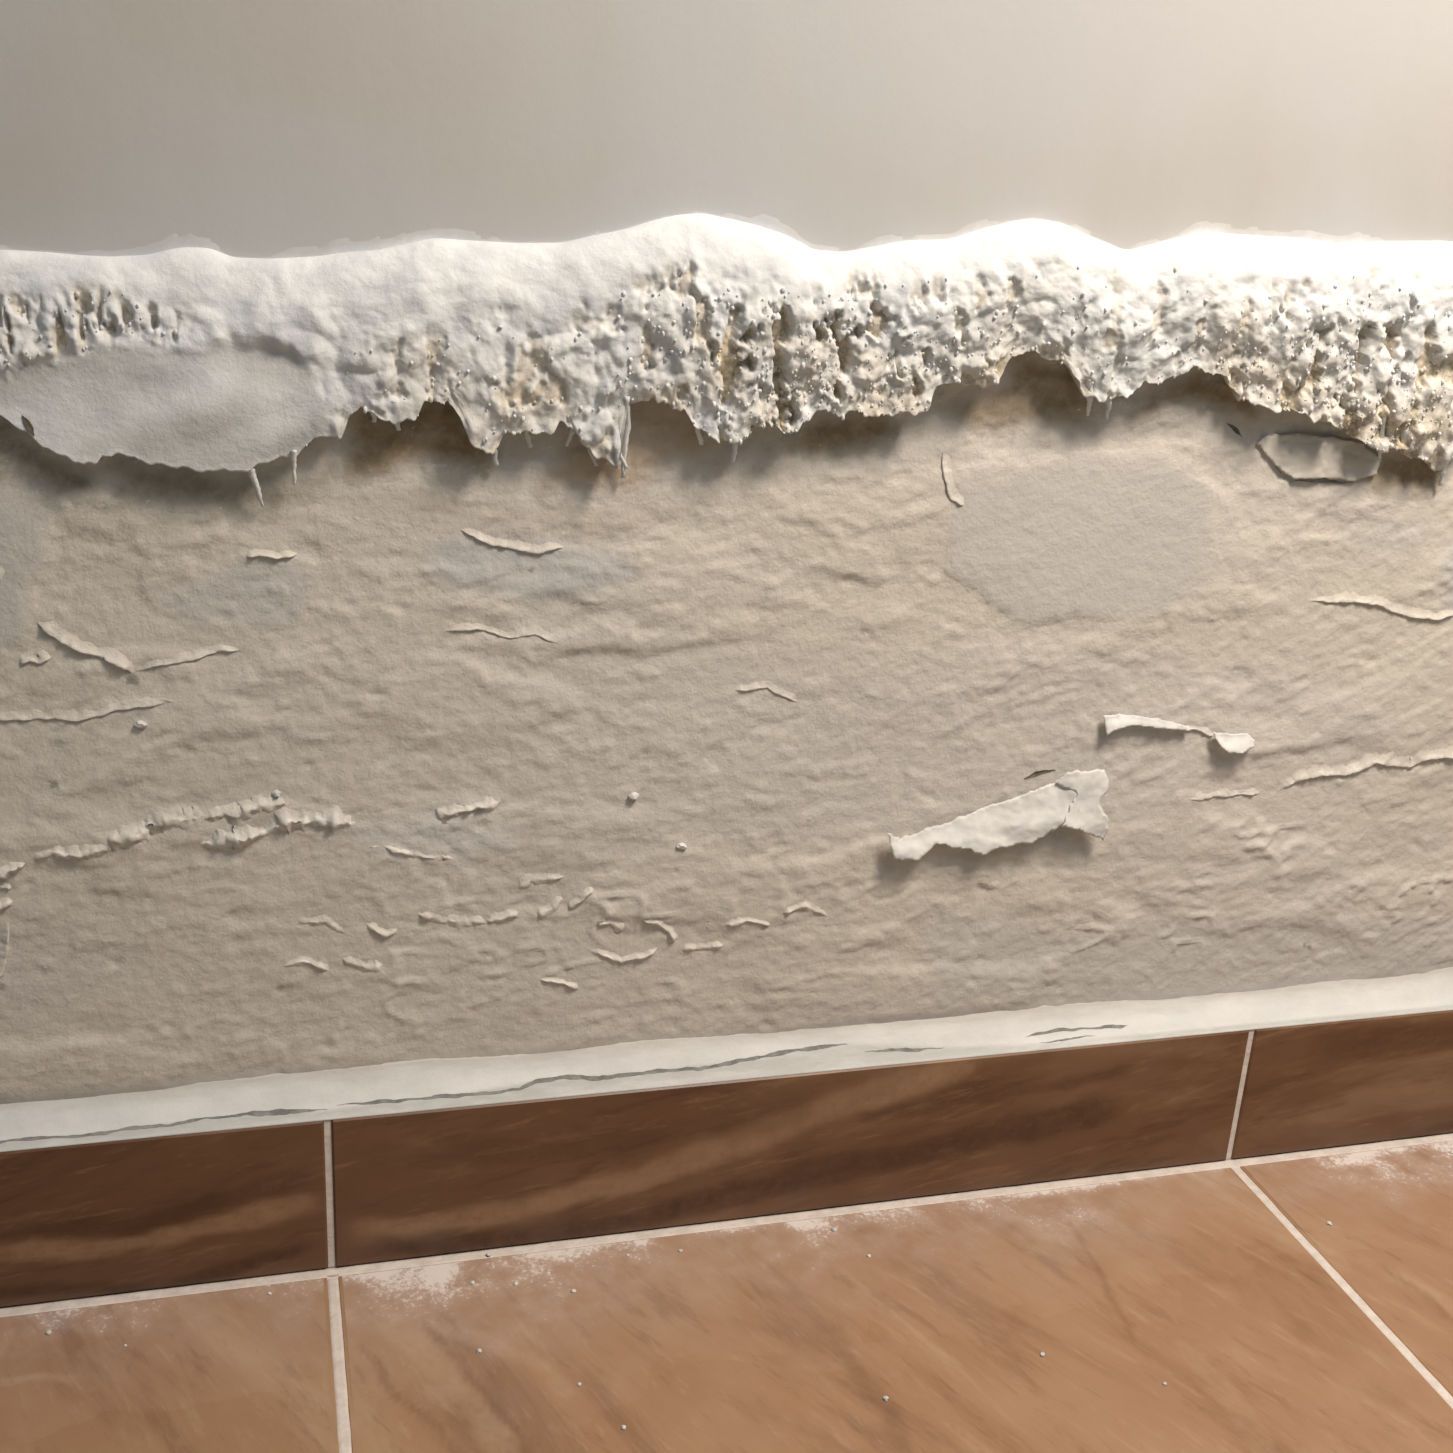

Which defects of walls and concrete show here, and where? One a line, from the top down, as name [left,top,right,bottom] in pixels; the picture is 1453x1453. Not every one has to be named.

damp [0,210,1453,546]
peeling [460,528,564,554]
peeling [1103,714,1255,754]
peeling [887,769,1109,861]